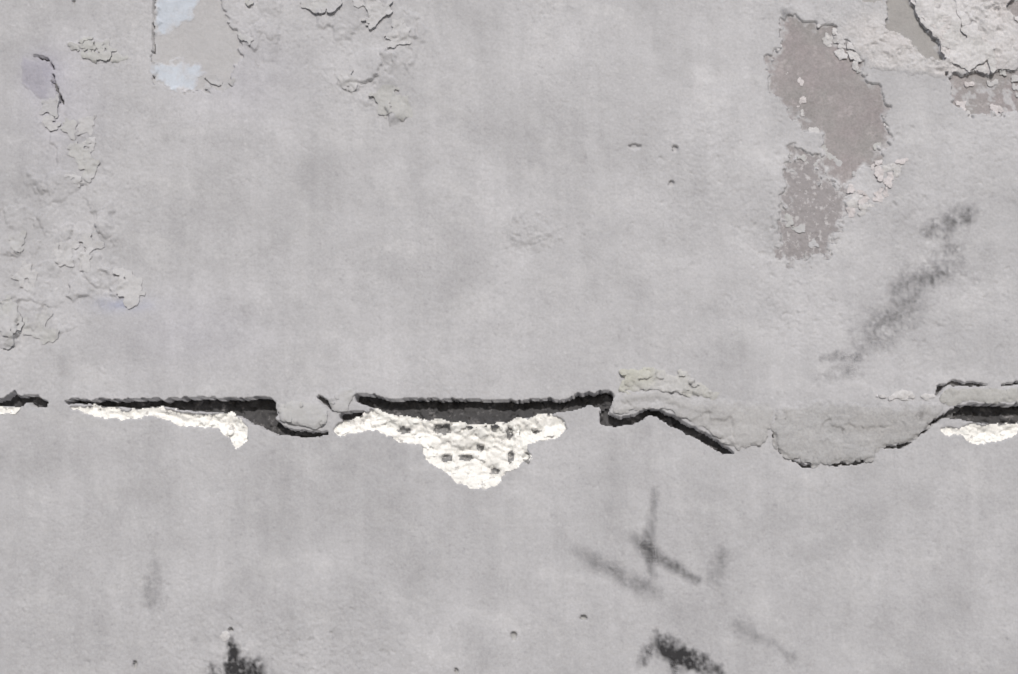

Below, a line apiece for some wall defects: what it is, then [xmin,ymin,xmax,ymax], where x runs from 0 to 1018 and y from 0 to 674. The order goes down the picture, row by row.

flaking render [149,0,284,95]
flaking render [300,0,429,127]
flaking render [764,0,1018,269]
flaking render [0,56,146,351]
crack [0,395,49,407]
flaking render [71,404,248,449]
crack [73,393,732,454]
flaking render [334,408,566,489]
crack [792,460,863,468]
crack [884,381,1018,449]
flaking render [941,423,1018,445]